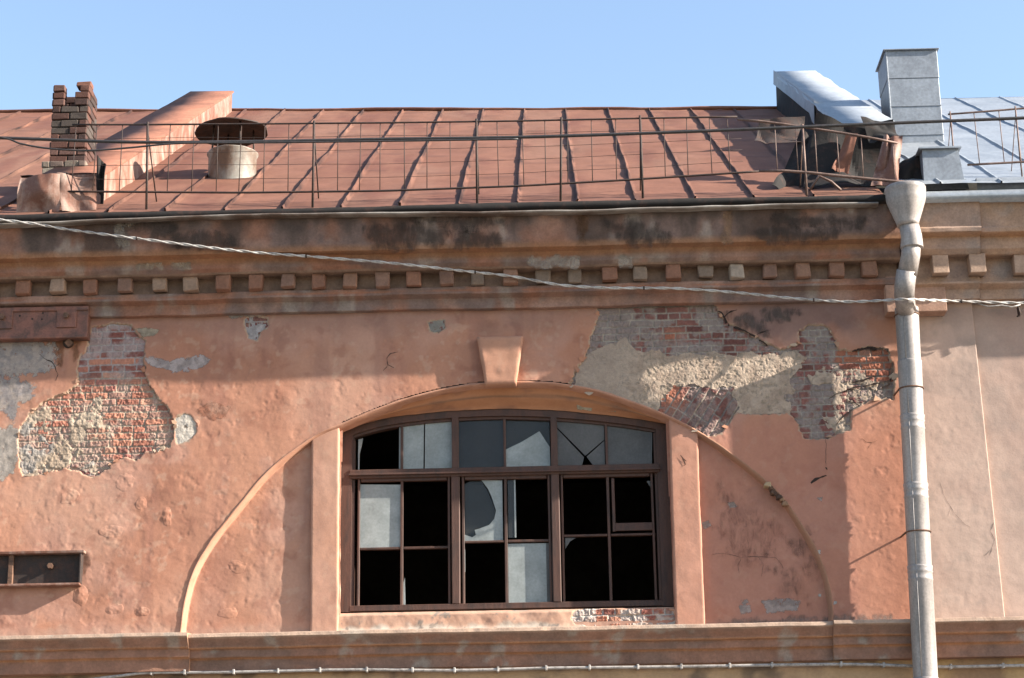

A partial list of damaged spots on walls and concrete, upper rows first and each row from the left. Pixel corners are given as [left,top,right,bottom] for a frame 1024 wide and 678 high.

spalling [0,324,231,482]
spalling [229,315,268,340]
spalling [570,305,898,440]
crack [718,310,768,346]
crack [811,346,894,484]
spalling [572,608,675,626]